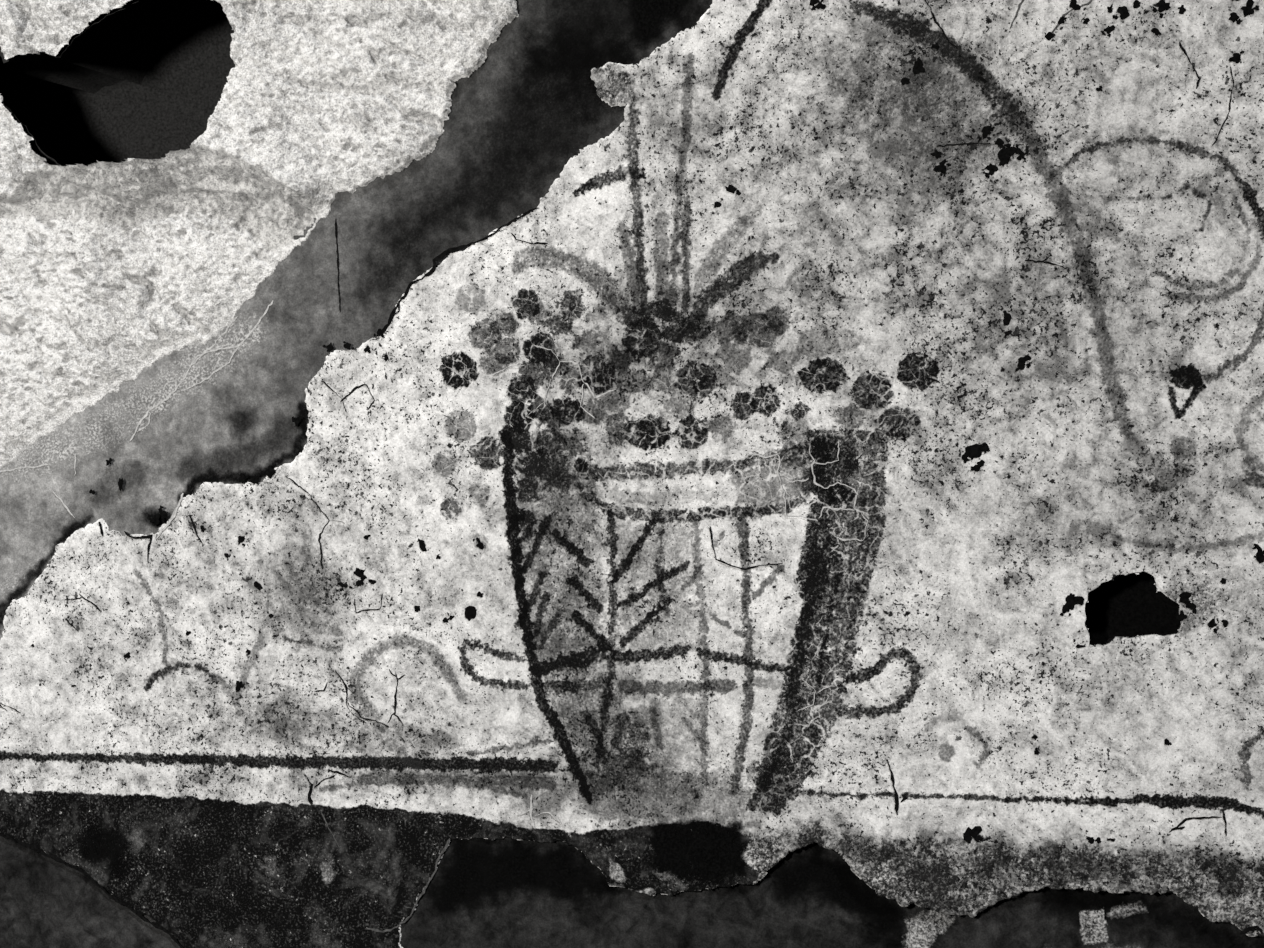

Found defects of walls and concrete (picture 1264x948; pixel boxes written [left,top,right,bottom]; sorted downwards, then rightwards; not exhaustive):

peeling [712,184,741,208]
spalling [0,0,519,469]
peeling [239,465,276,485]
peeling [150,505,168,526]
peeling [337,568,376,591]
peeling [442,591,483,623]
peeling [963,826,983,843]
spalling [0,836,184,948]
spalling [400,837,1264,948]